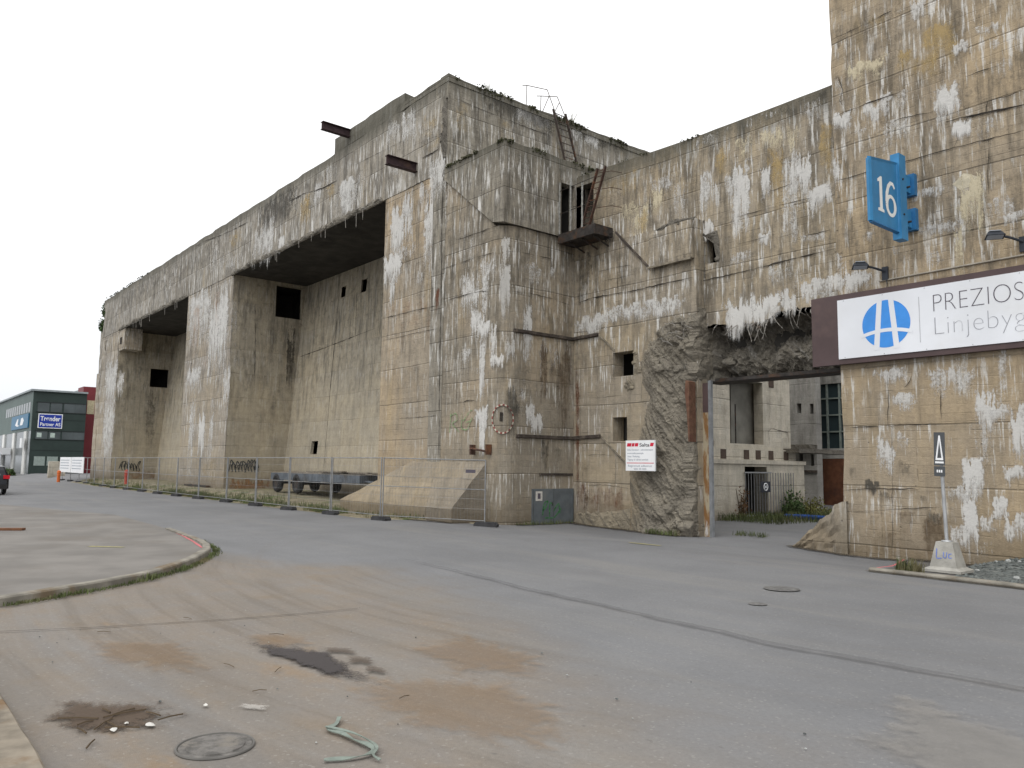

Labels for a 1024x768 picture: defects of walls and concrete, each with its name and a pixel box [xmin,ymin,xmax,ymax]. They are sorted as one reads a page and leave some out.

leakage [912,0,926,20]
leakage [848,53,887,81]
leakage [833,90,908,141]
leakage [933,80,971,138]
leakage [252,188,295,263]
leakage [927,171,1022,271]
leakage [725,254,872,338]
leakage [186,281,237,475]
leakage [461,237,570,456]
spalling [624,306,841,537]
leakage [893,392,915,409]
leakage [924,350,1024,553]